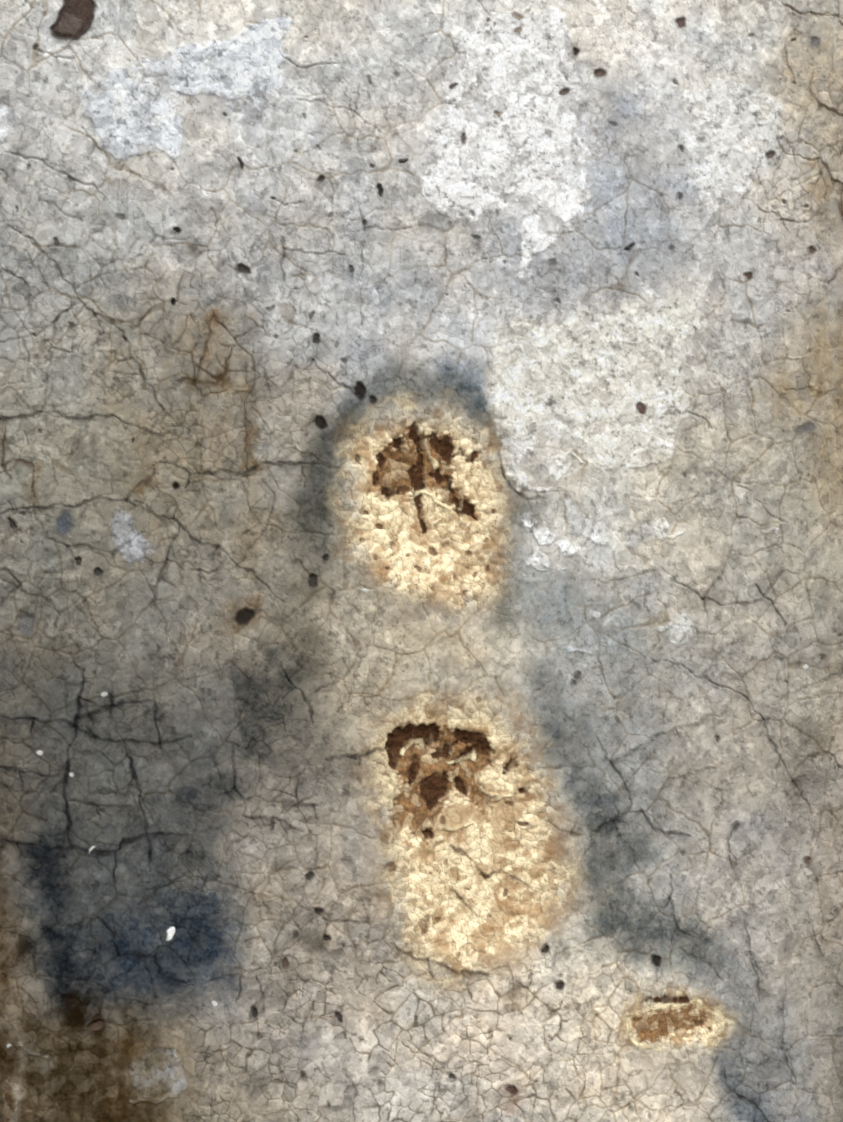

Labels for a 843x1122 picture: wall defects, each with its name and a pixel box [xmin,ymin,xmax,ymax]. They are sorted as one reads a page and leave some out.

crack [818,102,843,116]
crack [140,319,255,394]
crack [0,411,135,514]
crack [244,439,331,476]
spalling [336,295,701,611]
crack [5,669,184,877]
crack [226,776,317,831]
crack [332,747,386,759]
spalling [370,692,576,987]
crack [573,758,686,836]
crack [395,945,488,999]
spalling [620,986,733,1062]